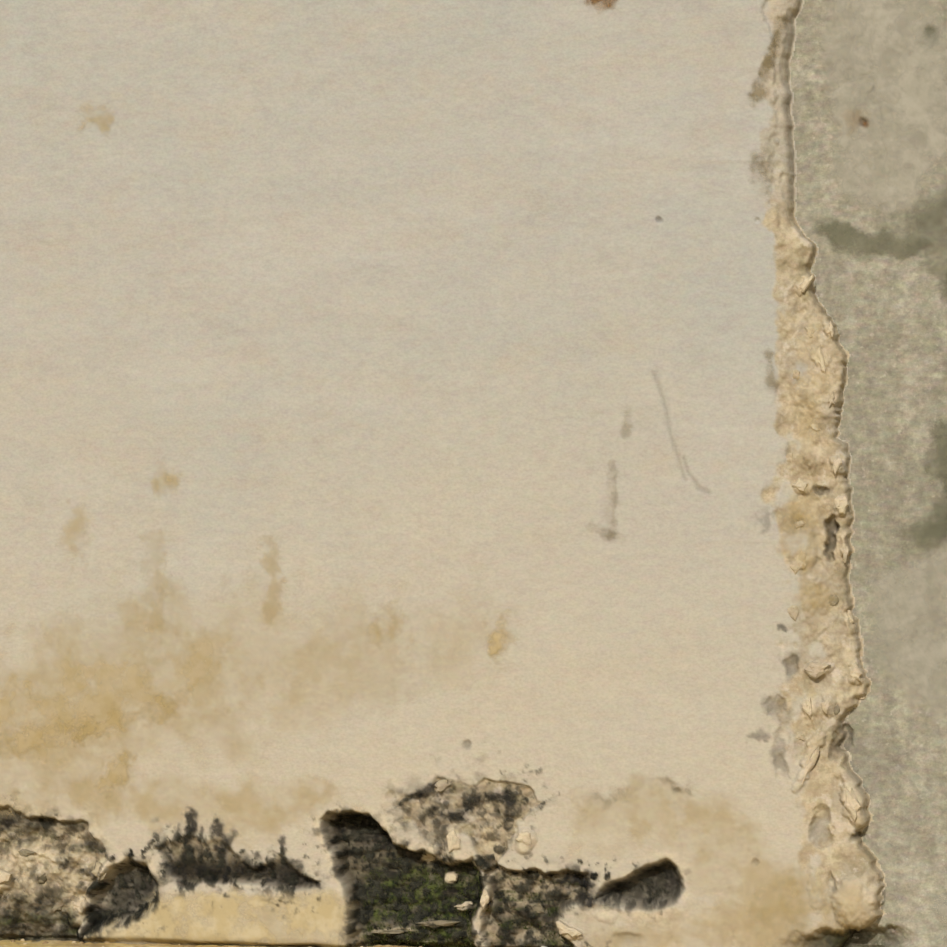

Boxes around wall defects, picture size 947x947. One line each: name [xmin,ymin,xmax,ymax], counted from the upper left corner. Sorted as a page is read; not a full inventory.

damp [831,0,947,209]
damp [818,220,927,258]
peeling [750,0,947,947]
damp [879,564,947,698]
spalling [0,774,686,947]
damp [399,782,436,805]
damp [429,785,528,830]